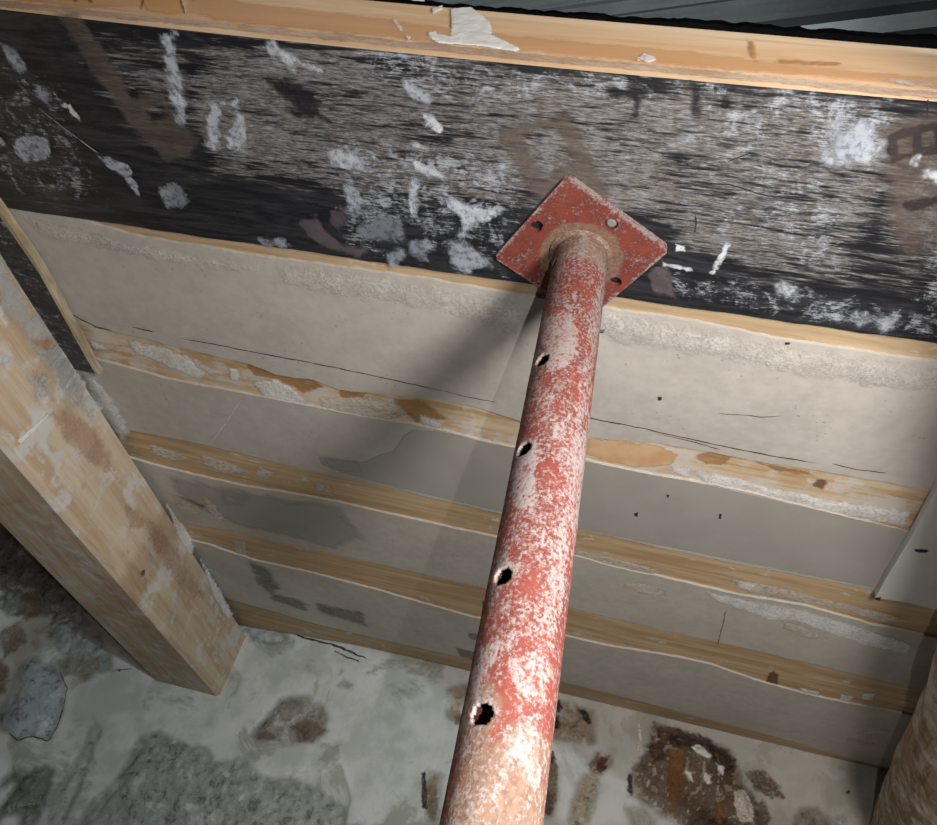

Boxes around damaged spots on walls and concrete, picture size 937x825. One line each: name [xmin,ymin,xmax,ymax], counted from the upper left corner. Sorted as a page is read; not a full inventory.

leakage [403,80,443,133]
leakage [413,161,444,178]
leakage [446,199,500,273]
leakage [387,240,433,268]
leakage [656,263,692,276]
peeling [248,364,322,392]
peeling [340,390,366,398]
peeling [586,439,677,467]
peeling [698,452,731,464]
peeling [769,465,826,488]
corrosion [421,772,437,817]
corrosion [545,751,558,815]